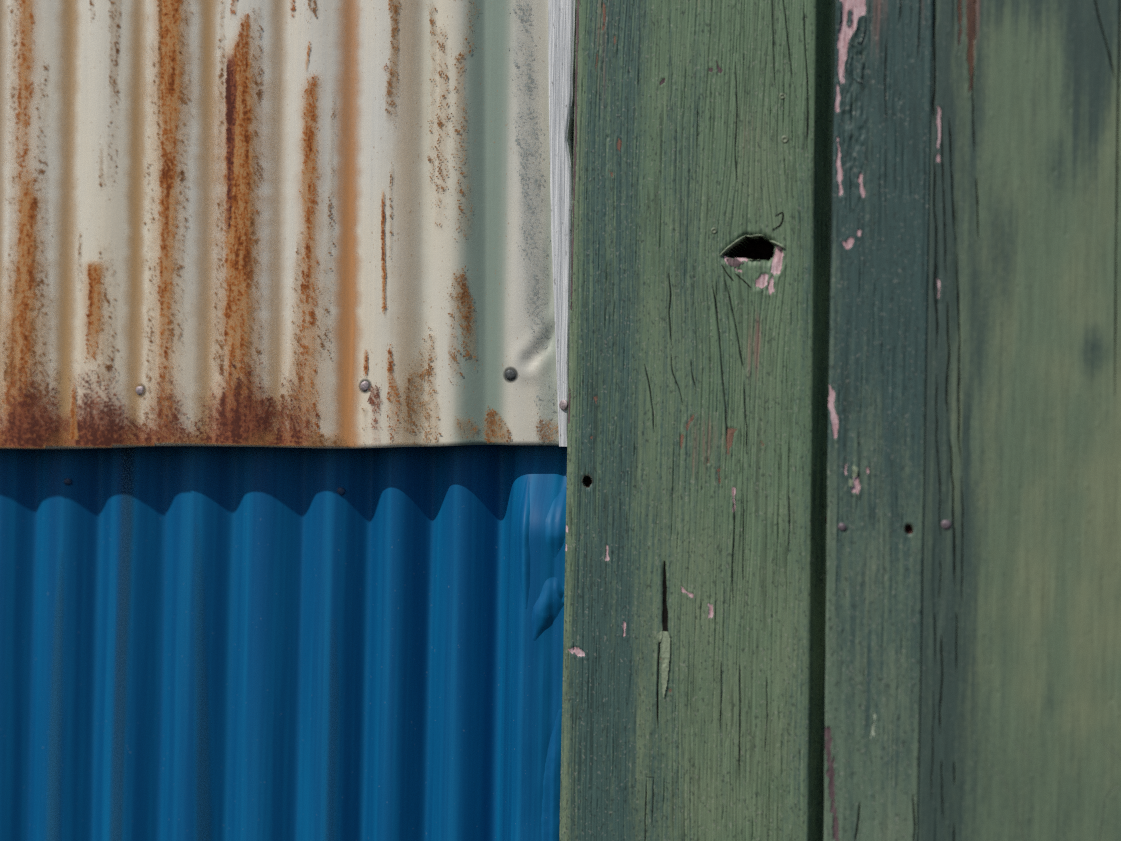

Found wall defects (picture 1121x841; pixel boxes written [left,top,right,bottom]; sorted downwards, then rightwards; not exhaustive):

rust [0,0,347,448]
rust [381,163,393,312]
rust [384,0,401,125]
rust [426,3,480,248]
peeling [720,234,785,295]
peeling [835,0,866,112]
peeling [958,0,976,92]
crack [1095,0,1121,386]
rust [362,266,477,444]
peeling [828,384,838,439]
crack [657,561,670,724]
peeling [825,727,839,841]